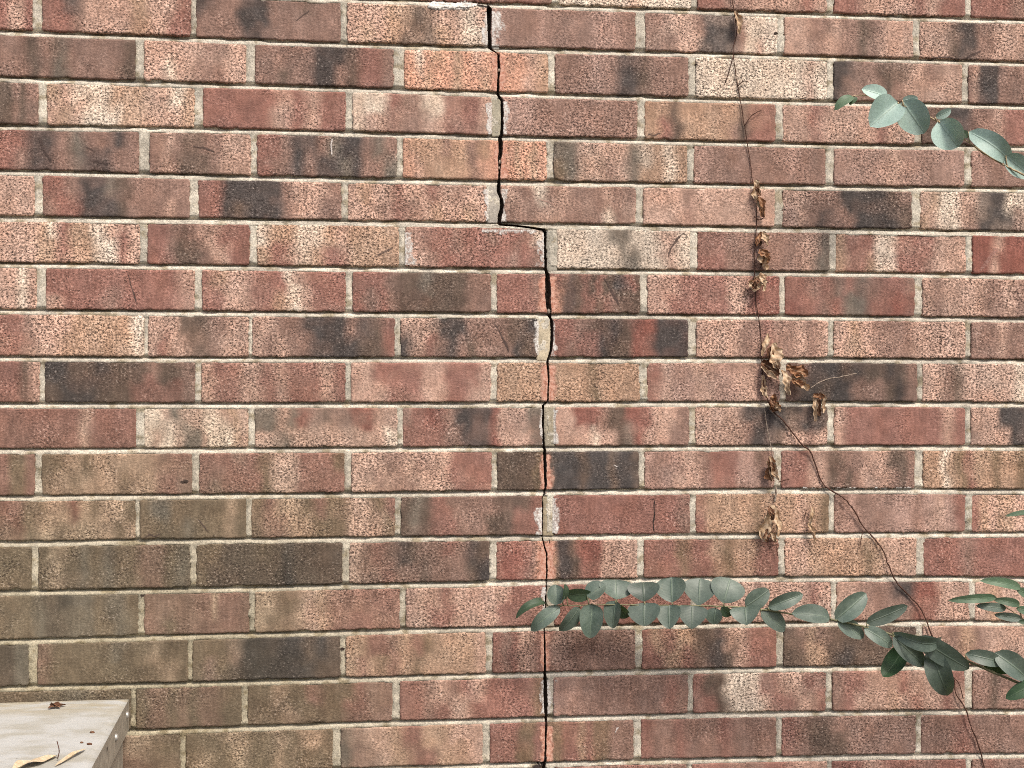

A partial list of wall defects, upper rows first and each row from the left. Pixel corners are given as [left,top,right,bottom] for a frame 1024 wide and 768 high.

crack [477,4,553,768]